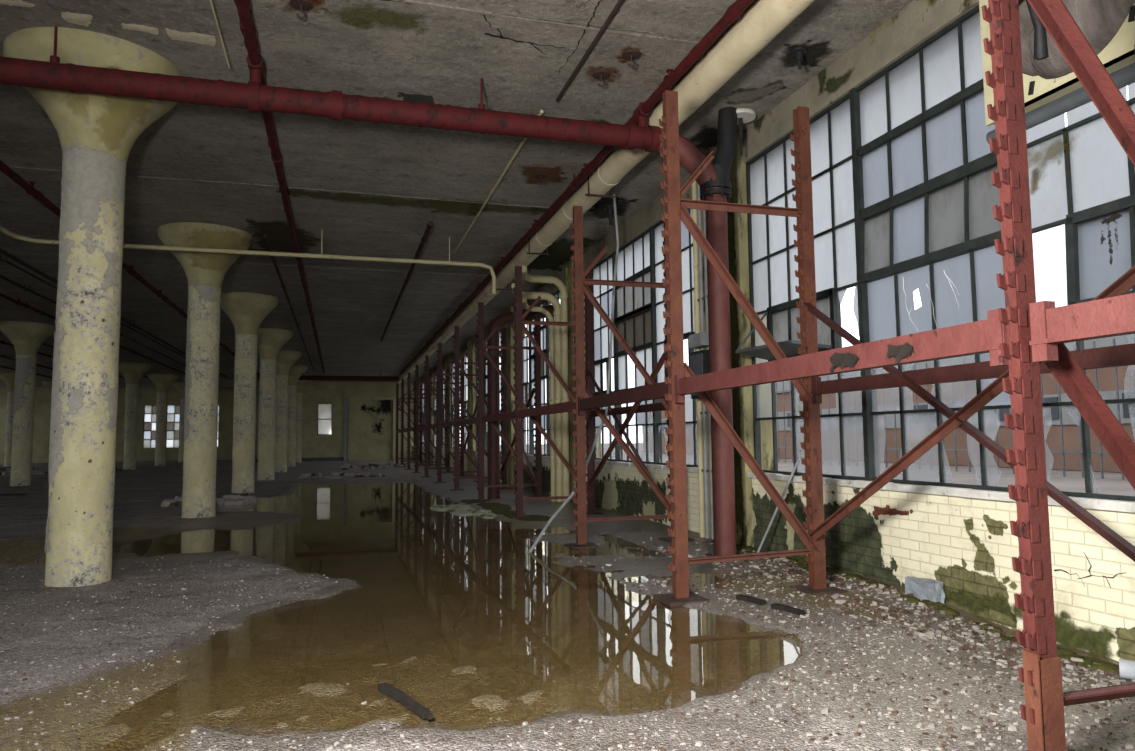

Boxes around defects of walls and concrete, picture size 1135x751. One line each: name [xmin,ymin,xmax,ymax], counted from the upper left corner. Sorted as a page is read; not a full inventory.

peeling [0,0,35,8]
peeling [61,11,93,27]
mould [323,5,418,28]
peeling [121,23,216,47]
crack [483,0,681,83]
peeling [47,143,127,503]
crack [1054,553,1126,588]